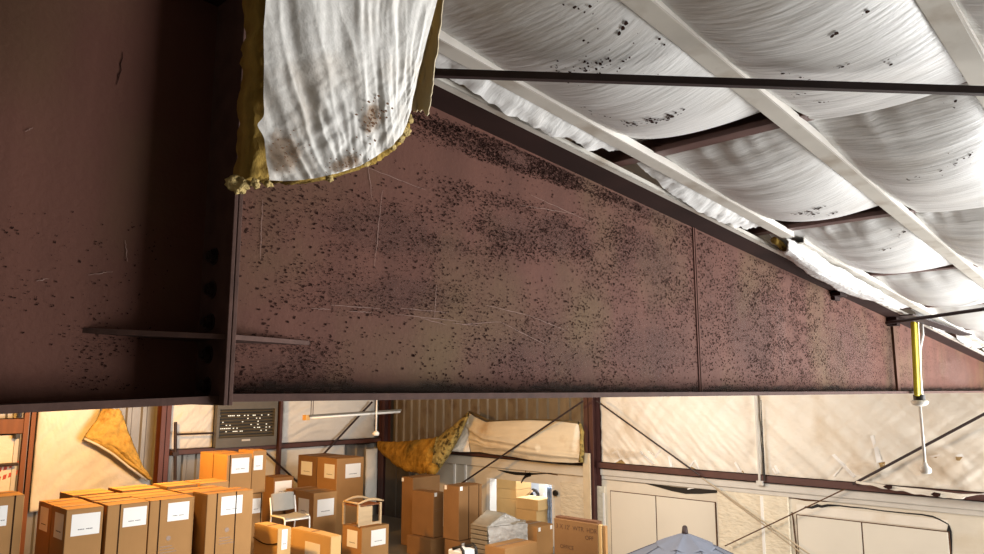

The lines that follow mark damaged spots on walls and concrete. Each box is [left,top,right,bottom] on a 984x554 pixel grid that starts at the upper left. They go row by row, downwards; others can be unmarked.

rust [233,109,982,390]
mould [581,107,685,127]